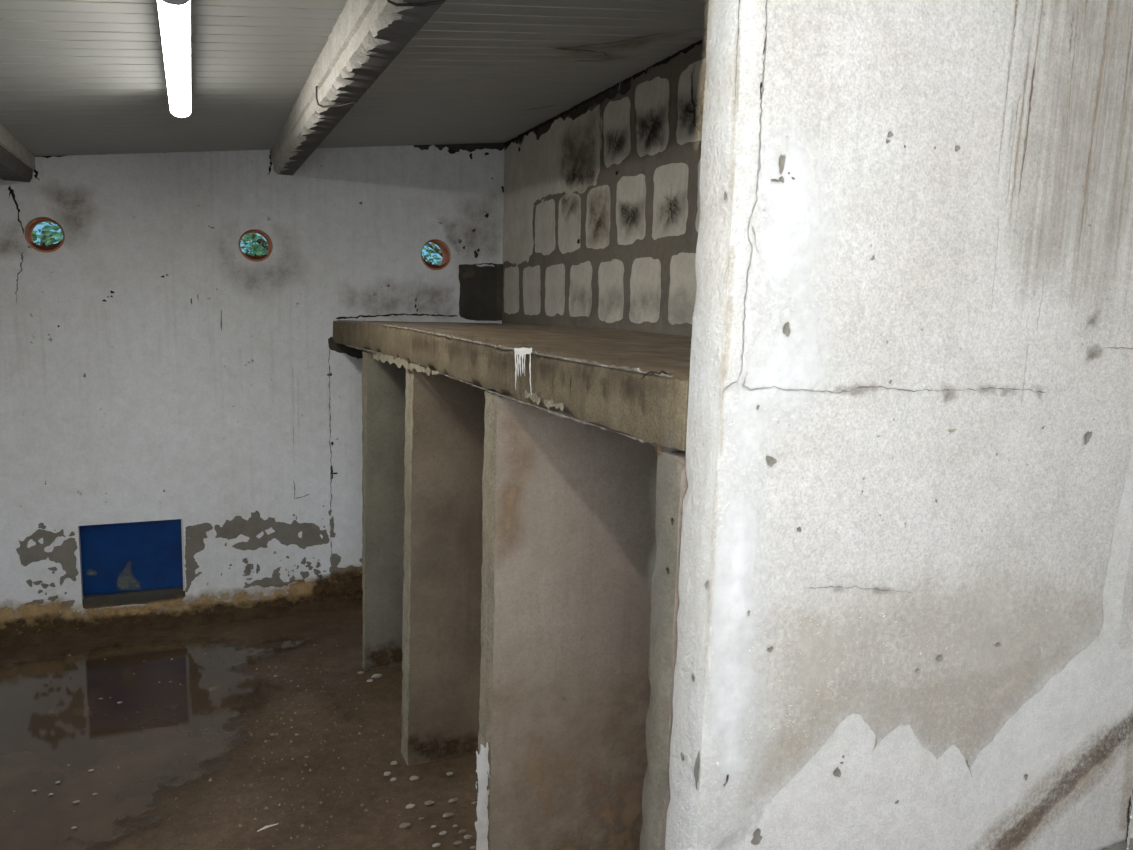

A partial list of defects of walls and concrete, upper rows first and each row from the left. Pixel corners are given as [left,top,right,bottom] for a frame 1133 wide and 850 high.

damp [680,64,704,131]
crack [8,155,67,301]
damp [562,197,606,239]
crack [722,0,1045,398]
damp [489,348,564,388]
peeling [16,523,78,608]
peeling [185,505,362,592]
damp [0,568,363,636]
peeling [1101,838,1133,850]